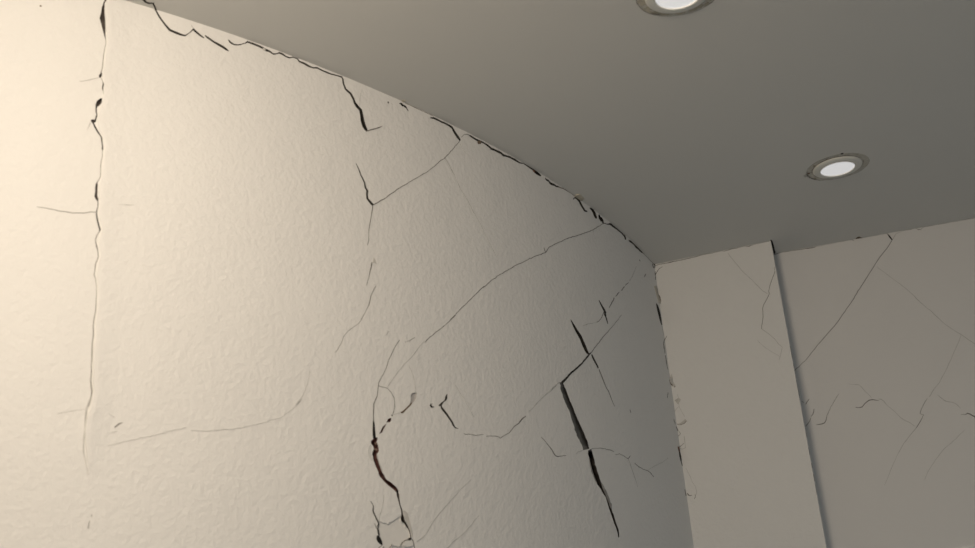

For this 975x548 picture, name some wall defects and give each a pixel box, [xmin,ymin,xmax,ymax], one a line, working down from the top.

crack [40,0,382,475]
flaking render [370,497,415,548]
crack [335,100,975,541]